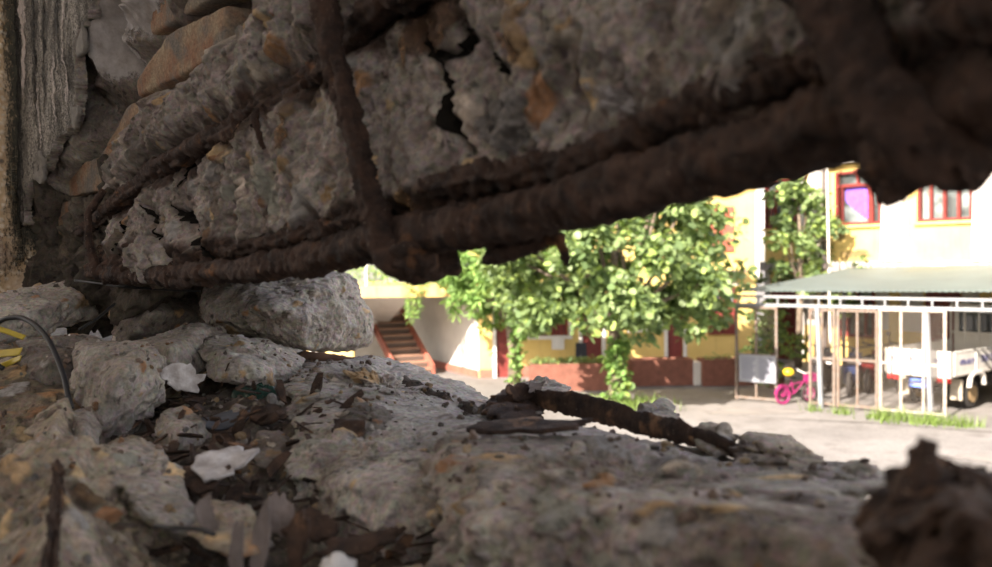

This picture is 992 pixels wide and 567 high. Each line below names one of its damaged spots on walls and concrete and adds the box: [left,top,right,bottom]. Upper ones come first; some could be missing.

corrosion [398,0,469,71]
corrosion [917,0,992,49]
spalling [58,0,252,236]
crack [423,27,512,155]
spalling [473,85,530,152]
corrosion [416,46,824,201]
corrosion [217,208,361,258]
corrosion [466,380,739,458]